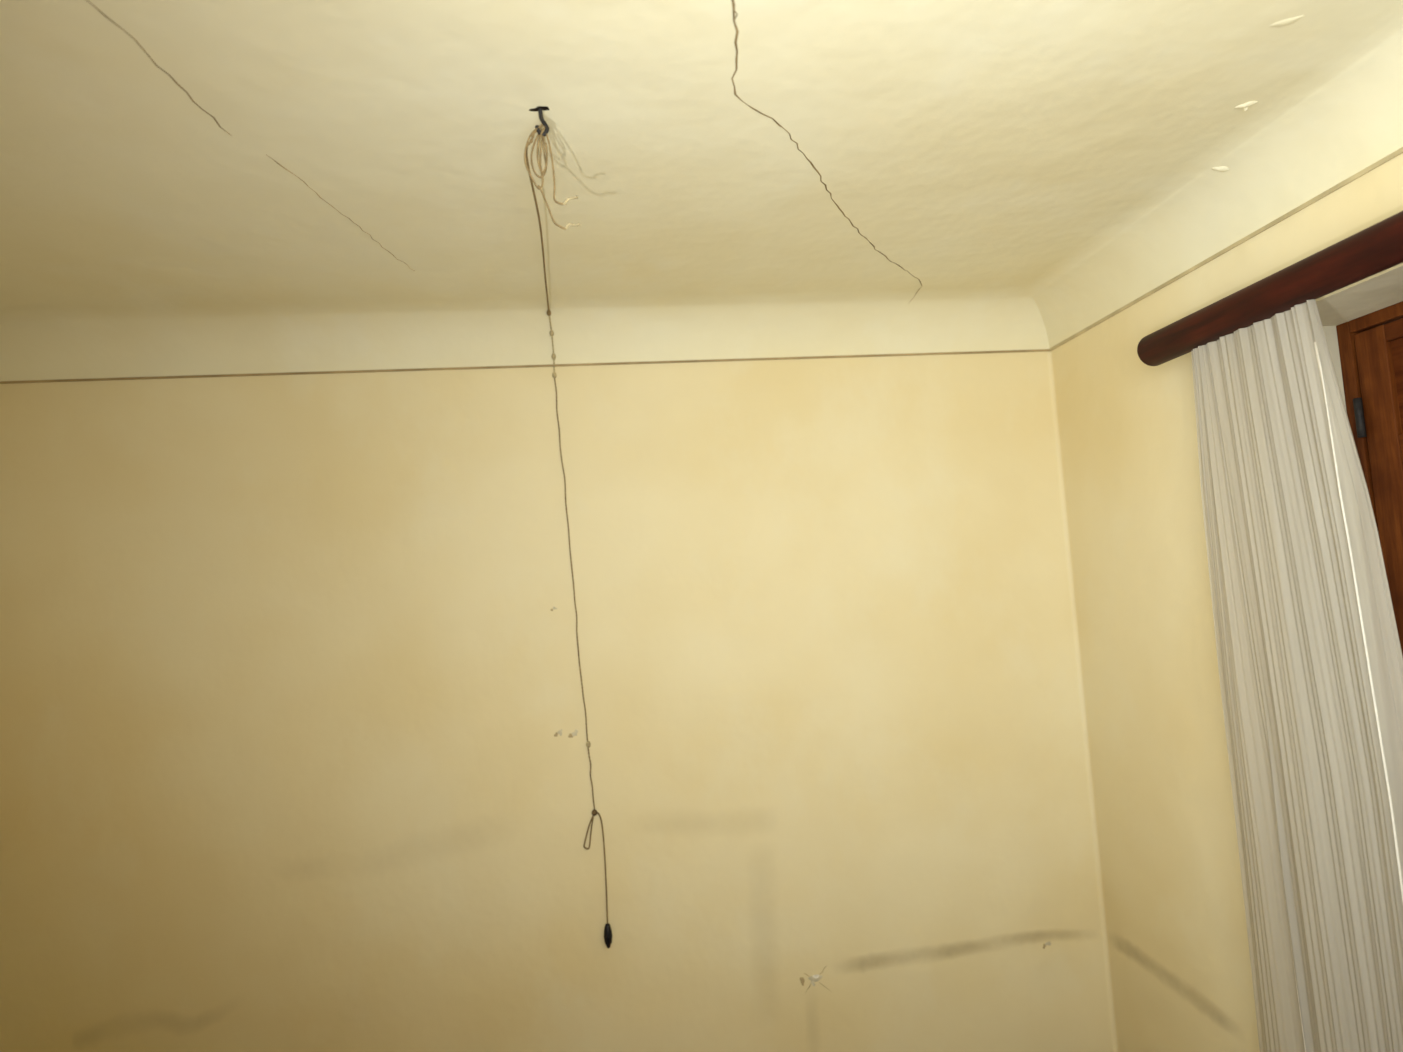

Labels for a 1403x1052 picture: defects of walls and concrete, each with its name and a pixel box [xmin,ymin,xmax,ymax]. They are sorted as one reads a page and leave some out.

crack [86,0,232,136]
crack [267,155,414,271]
crack [731,0,922,304]